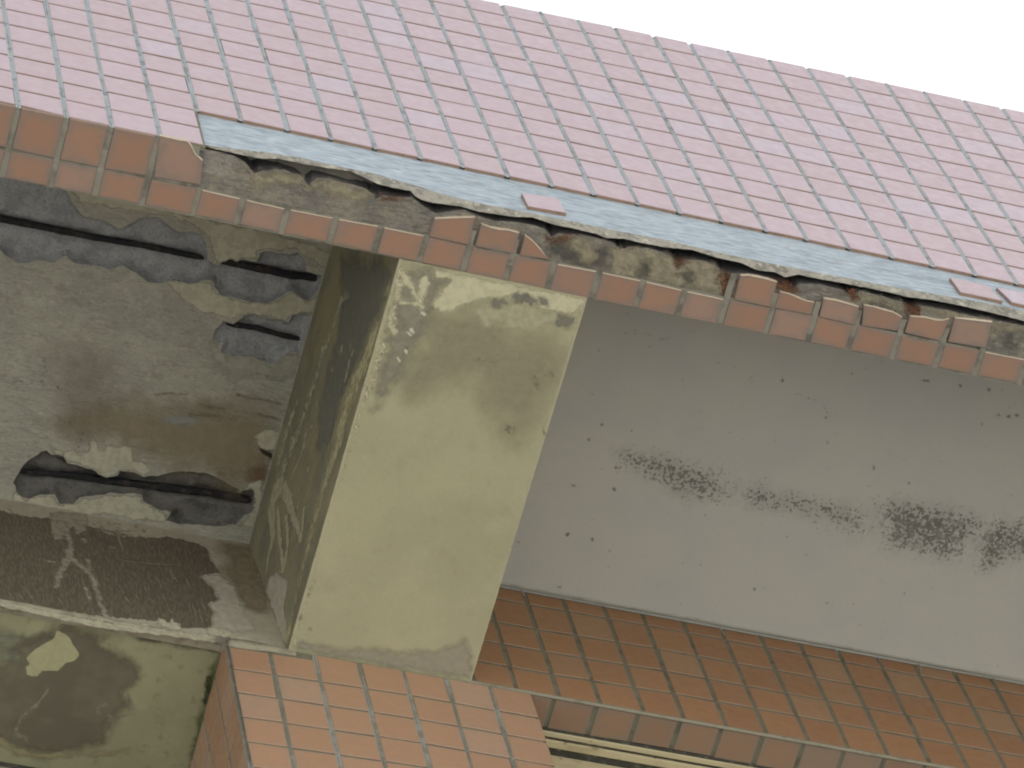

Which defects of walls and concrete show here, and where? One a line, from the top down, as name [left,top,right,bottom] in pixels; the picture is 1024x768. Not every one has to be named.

spalling [0,177,329,365]
leakage [378,269,447,396]
leakage [492,293,548,308]
leakage [556,313,574,327]
peeling [191,113,1024,358]
spalling [12,438,262,527]
leakage [625,455,722,498]
leakage [747,484,863,533]
leakage [881,502,1024,566]
peeling [0,575,254,676]
leakage [0,625,138,759]